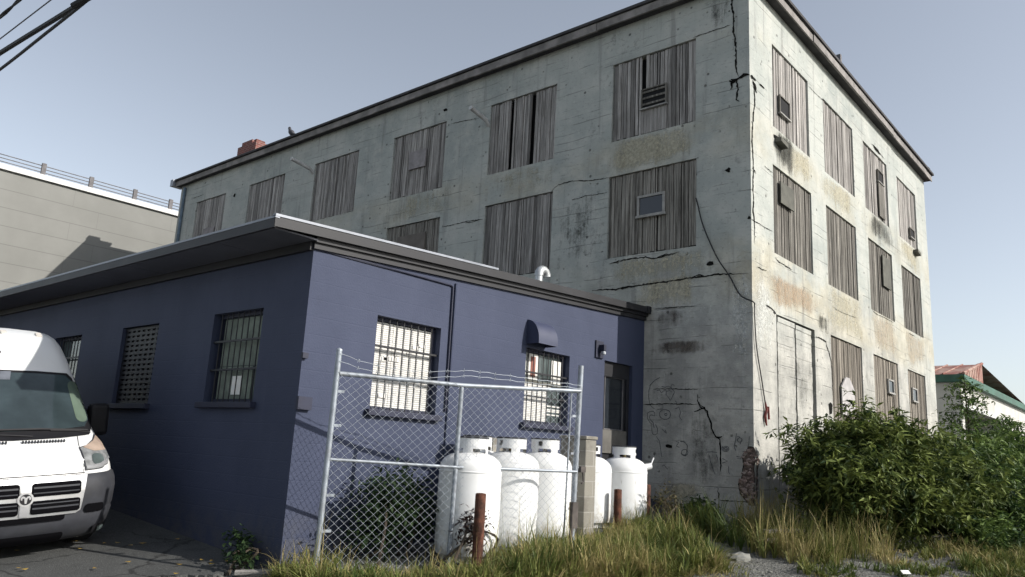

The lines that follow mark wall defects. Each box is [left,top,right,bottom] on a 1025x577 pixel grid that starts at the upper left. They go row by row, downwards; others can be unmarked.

crack [693,0,771,242]
crack [592,252,792,309]
crack [643,388,748,503]
spalling [738,446,760,510]